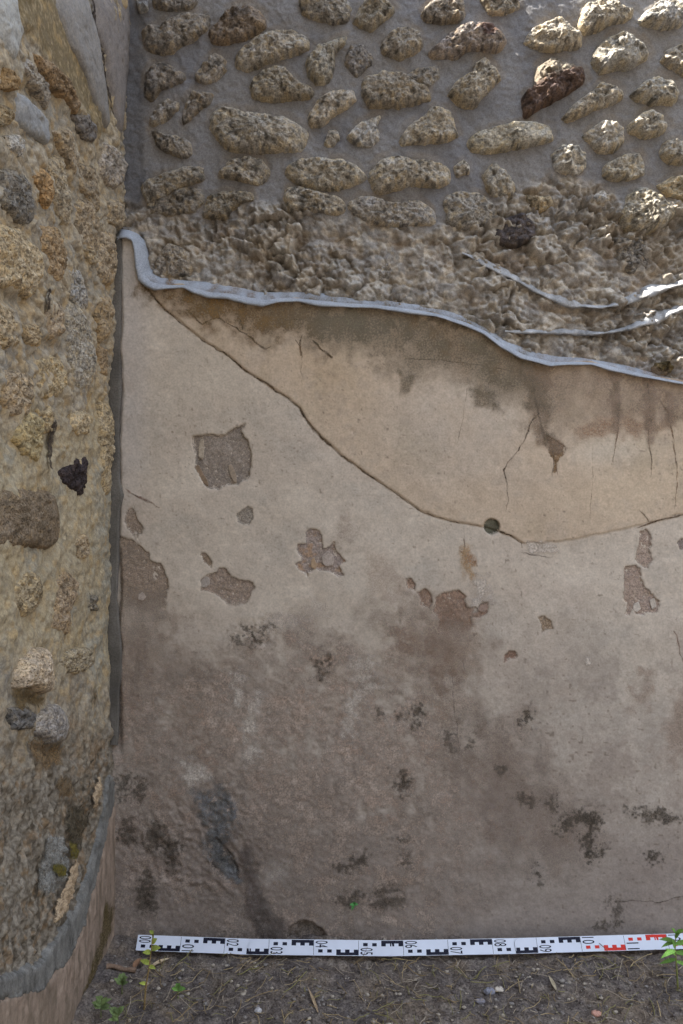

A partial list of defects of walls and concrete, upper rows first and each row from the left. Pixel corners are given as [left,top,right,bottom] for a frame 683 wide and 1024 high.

damp [134,277,683,452]
flaking render [193,426,251,490]
crack [147,289,476,563]
crack [641,383,680,527]
flaking render [120,510,168,604]
flaking render [201,553,255,604]
flaking render [296,529,345,576]
flaking render [407,578,488,627]
flaking render [624,529,659,615]
damp [112,613,604,940]